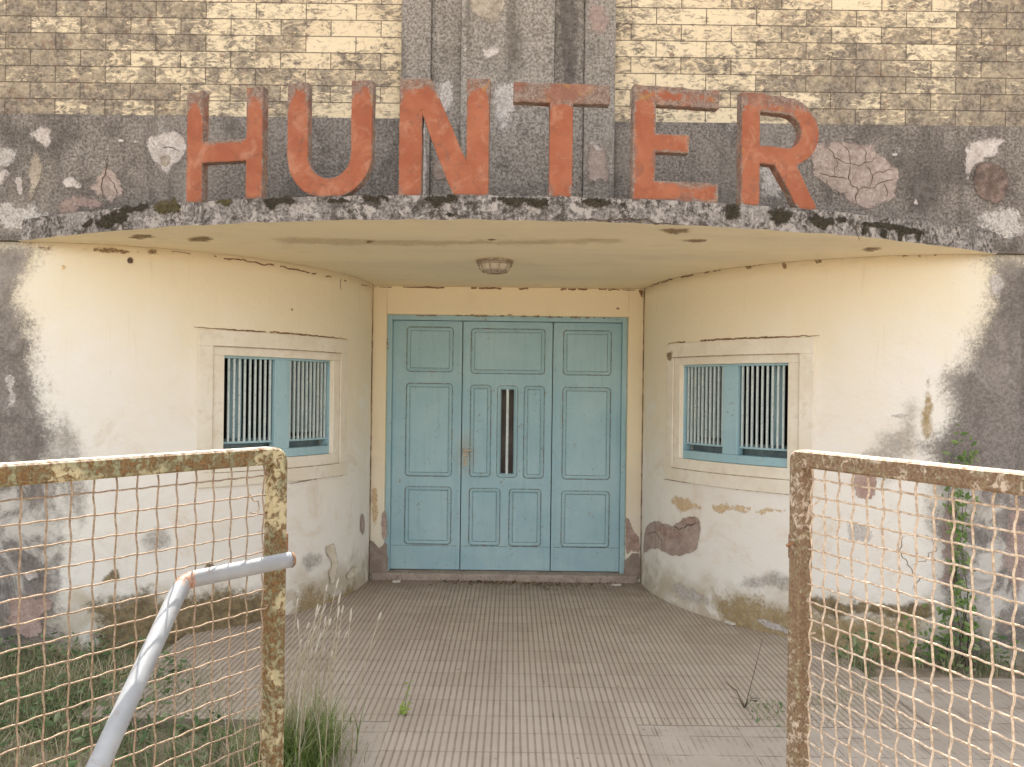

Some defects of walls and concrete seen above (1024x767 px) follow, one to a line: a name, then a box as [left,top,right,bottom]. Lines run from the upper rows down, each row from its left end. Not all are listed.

spalling [63,163,123,203]
spalling [118,131,187,174]
spalling [965,137,1009,204]
damp [862,221,925,252]
damp [0,243,57,463]
damp [922,256,1024,471]
damp [0,483,64,650]
spalling [326,488,401,584]
spalling [612,496,781,586]
damp [811,490,1024,665]